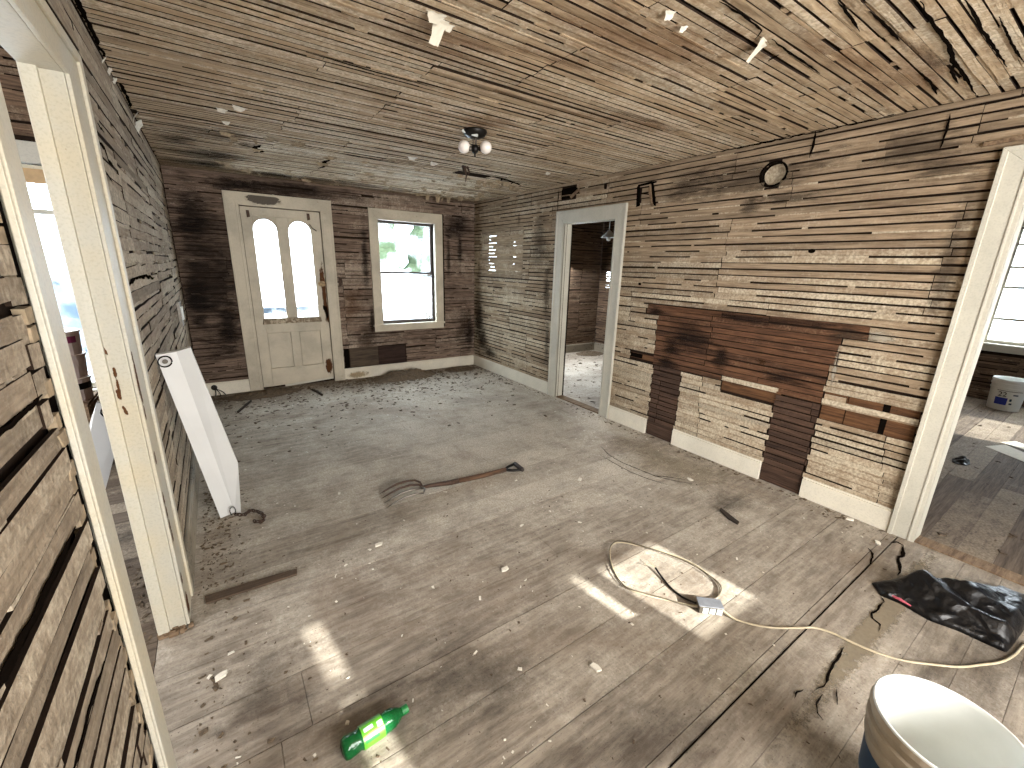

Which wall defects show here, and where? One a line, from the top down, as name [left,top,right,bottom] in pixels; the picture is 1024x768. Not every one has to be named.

crack [920,1,976,150]
crack [669,541,906,768]